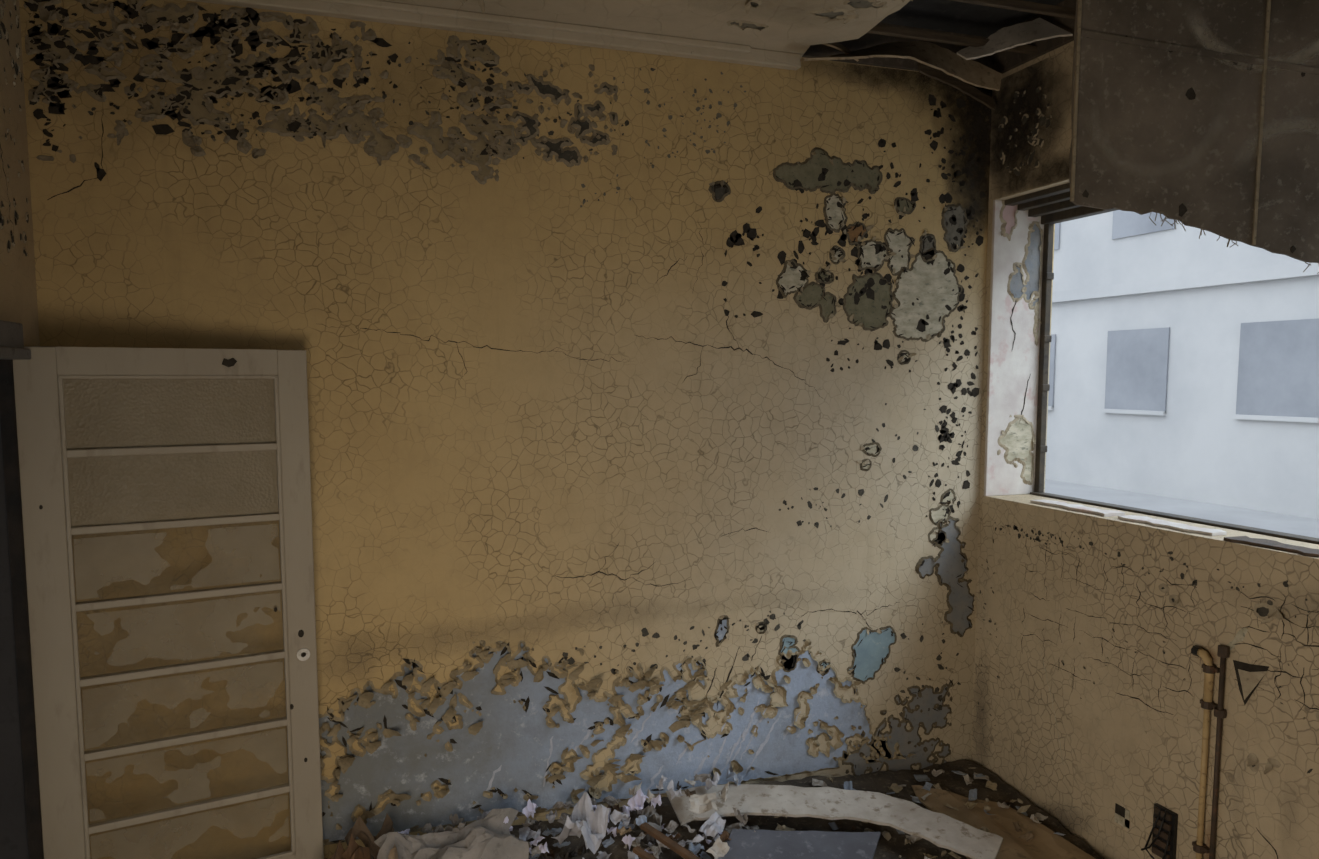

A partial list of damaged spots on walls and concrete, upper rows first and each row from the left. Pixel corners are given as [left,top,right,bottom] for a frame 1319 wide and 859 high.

mould [24,0,398,152]
mould [445,39,504,156]
peeling [998,87,1052,176]
peeling [999,200,1044,346]
peeling [319,94,1000,846]
peeling [997,415,1036,485]
crack [1021,545,1197,715]
crack [1234,592,1319,712]